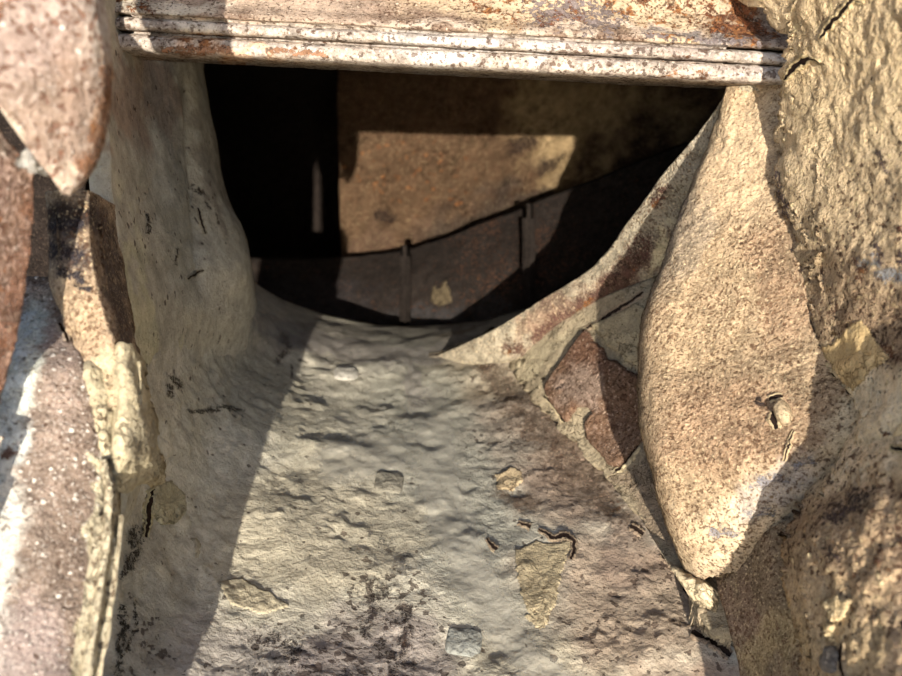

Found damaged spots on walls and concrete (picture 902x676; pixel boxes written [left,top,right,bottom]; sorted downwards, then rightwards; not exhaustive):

corrosion [493,1,589,27]
corrosion [686,0,772,41]
crack [781,0,865,81]
corrosion [76,64,112,178]
peeling [591,302,645,365]
peeling [821,321,889,391]
damp [367,531,410,575]
crack [485,537,499,553]
peeling [515,540,571,629]
crack [517,520,578,559]
damp [236,617,310,676]
damp [341,582,419,676]